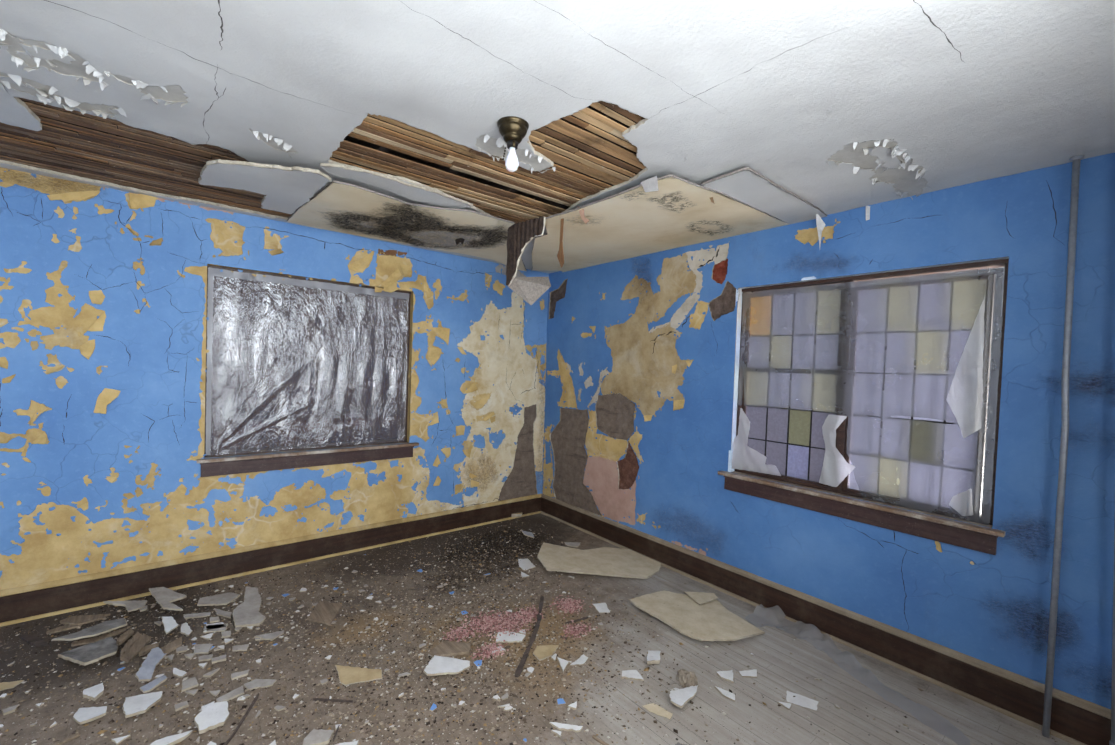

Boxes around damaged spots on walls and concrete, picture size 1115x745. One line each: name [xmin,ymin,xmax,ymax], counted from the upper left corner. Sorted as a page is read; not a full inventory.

peeling [0,29,190,119]
crack [45,0,352,144]
crack [913,0,964,62]
peeling [475,135,556,174]
peeling [826,138,931,200]
damp [332,204,507,249]
crack [74,201,206,445]
peeling [0,167,736,590]